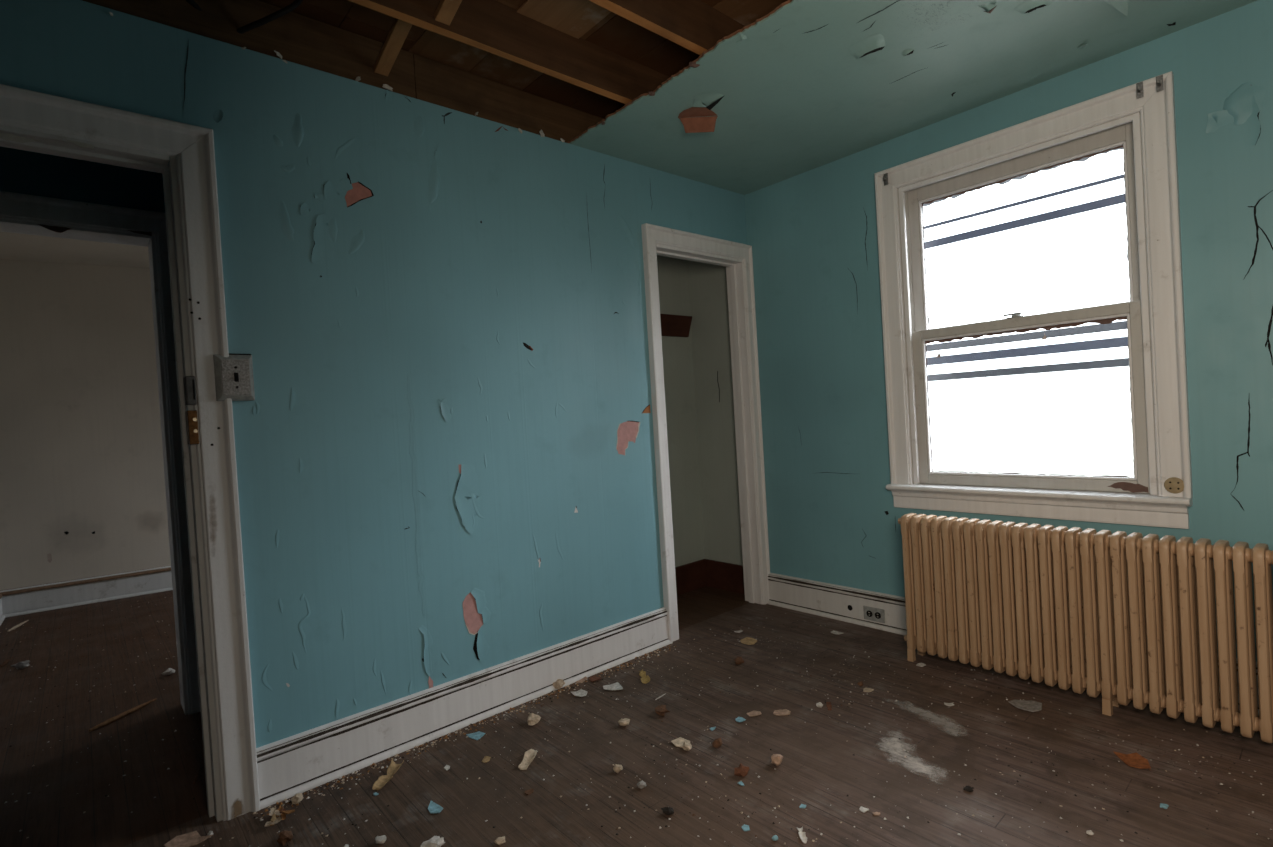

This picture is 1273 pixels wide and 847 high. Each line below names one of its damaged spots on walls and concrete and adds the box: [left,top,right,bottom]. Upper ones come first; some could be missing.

spalling [568,0,792,143]
peeling [345,182,374,207]
crack [1243,190,1273,280]
crack [1265,306,1273,365]
peeling [616,405,651,455]
crack [1232,400,1250,510]
peeling [463,588,491,635]